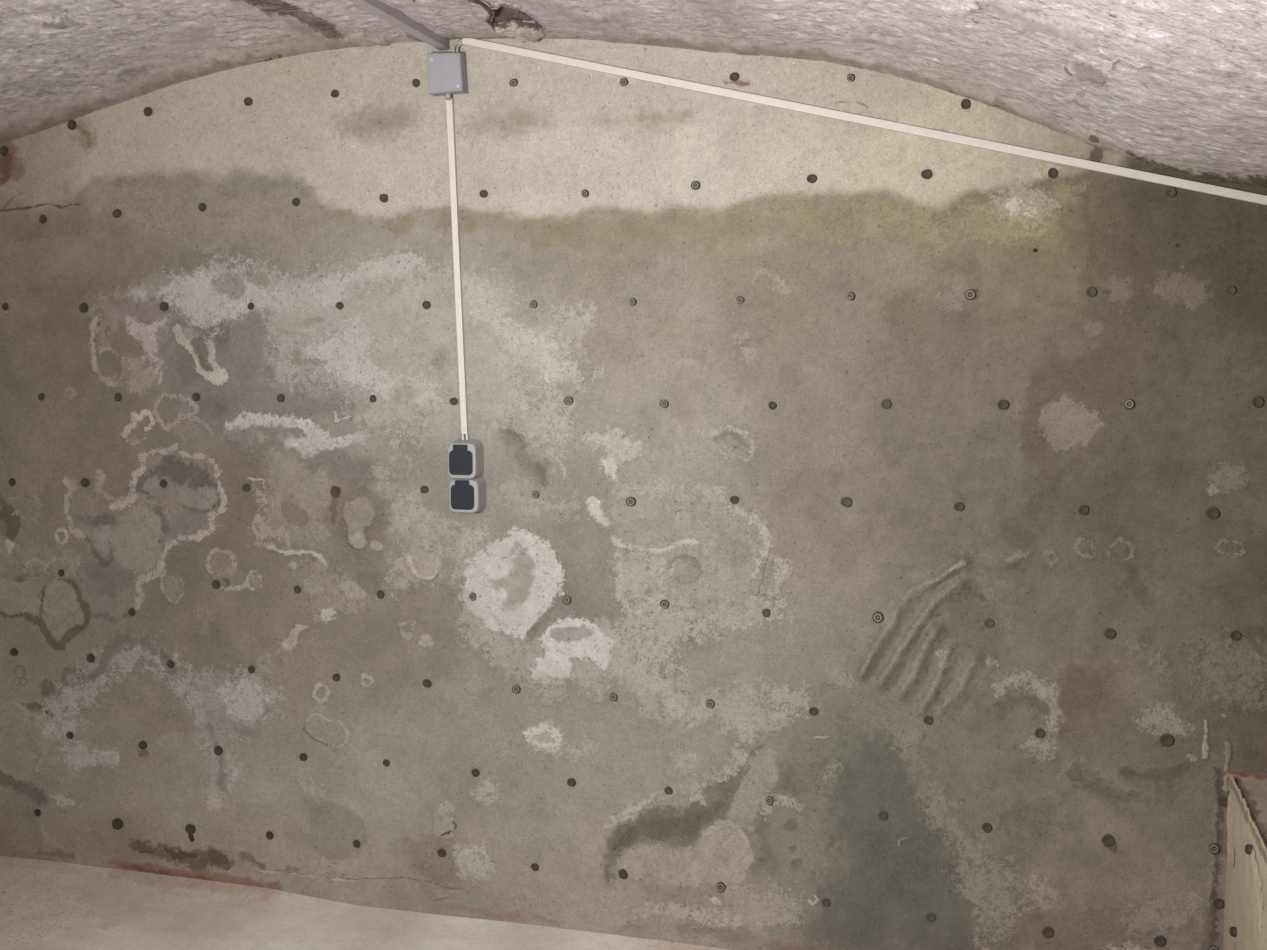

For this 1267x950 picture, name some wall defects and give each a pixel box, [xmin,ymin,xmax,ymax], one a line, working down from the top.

spalling [467,0,546,43]
leakage [0,160,1065,654]
leakage [926,175,1267,815]
leakage [19,621,332,827]
leakage [447,534,1235,950]
leakage [0,772,84,850]
corrosion [100,853,291,912]
leakage [121,774,370,884]
leakage [394,819,506,900]